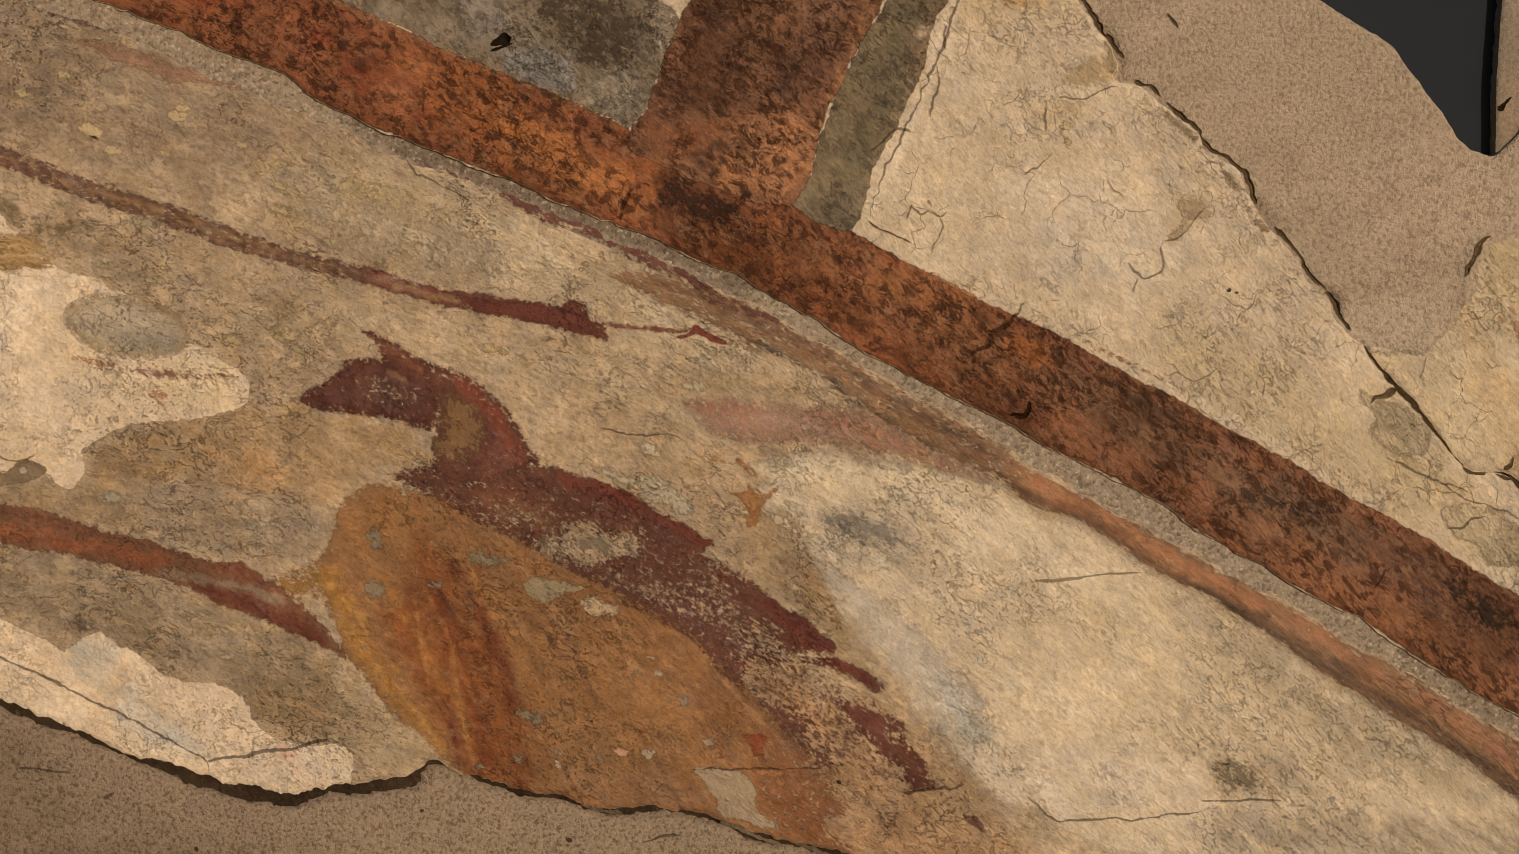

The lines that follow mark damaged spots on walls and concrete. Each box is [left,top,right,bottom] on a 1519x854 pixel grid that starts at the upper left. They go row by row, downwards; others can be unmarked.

crack [1081,0,1519,488]
crack [0,699,849,854]